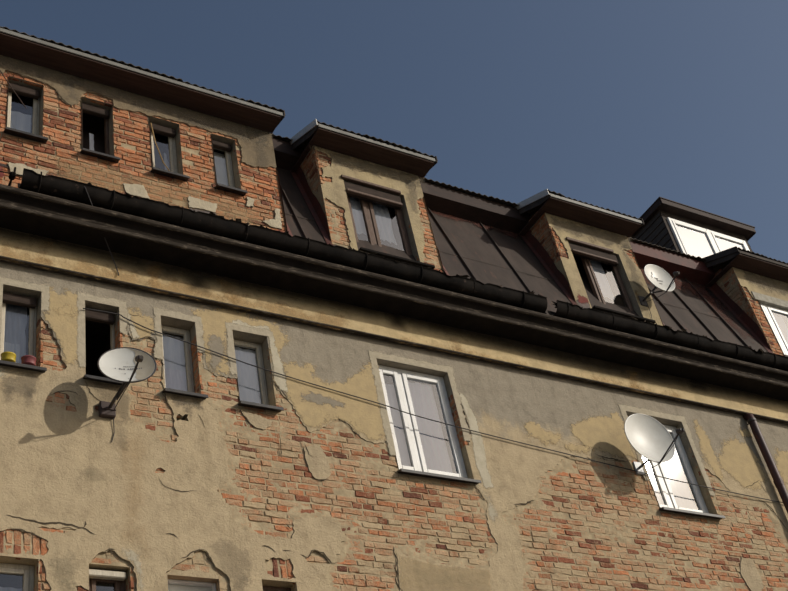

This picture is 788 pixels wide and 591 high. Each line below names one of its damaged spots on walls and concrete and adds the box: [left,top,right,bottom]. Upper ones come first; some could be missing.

flaking render [0,70,285,232]
flaking render [300,145,352,249]
flaking render [529,211,569,264]
flaking render [36,287,79,371]
flaking render [714,268,784,356]
flaking render [46,392,77,412]
flaking render [191,308,498,591]
flaking render [0,526,80,591]
crack [9,515,115,555]
flaking render [90,550,143,591]
flaking render [166,550,231,591]
flaking render [501,412,788,591]